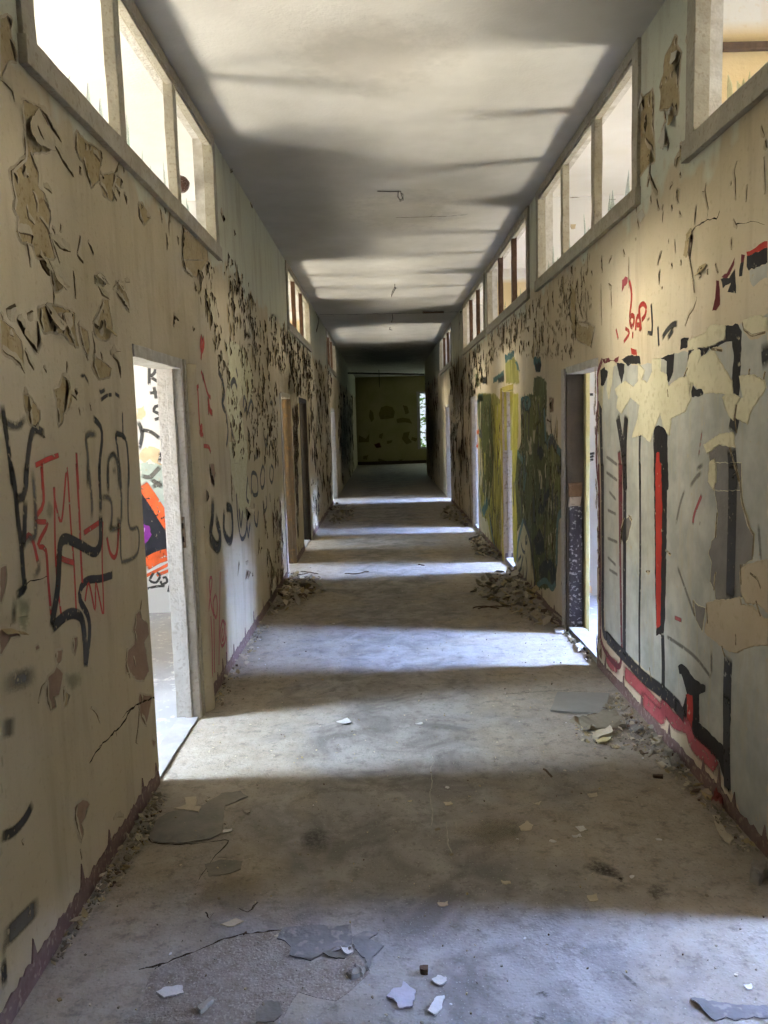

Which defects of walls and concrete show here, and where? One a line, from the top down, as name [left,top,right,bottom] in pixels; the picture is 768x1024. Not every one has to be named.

peeling [635,34,719,326]
peeling [0,13,629,598]
peeling [742,315,767,340]
peeling [593,324,768,657]
crack [90,697,154,762]
crack [139,902,278,970]
peeling [116,930,369,1024]